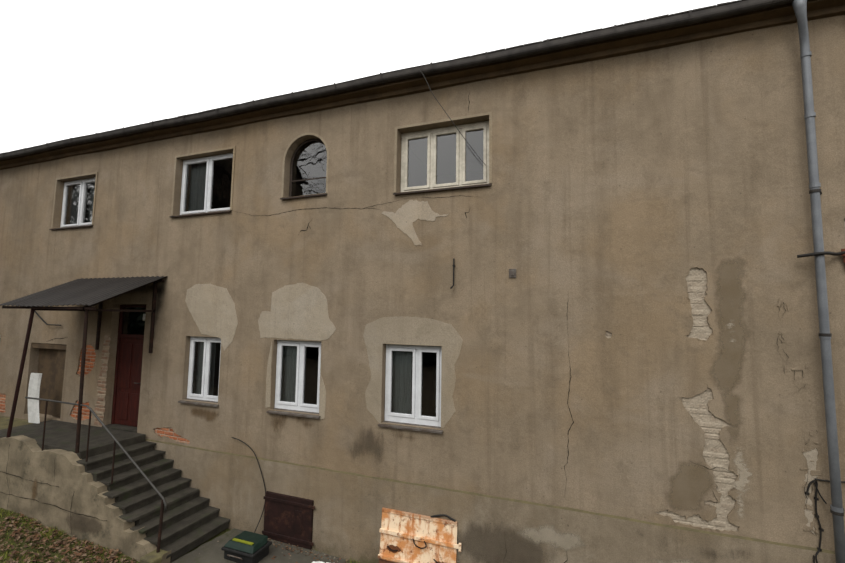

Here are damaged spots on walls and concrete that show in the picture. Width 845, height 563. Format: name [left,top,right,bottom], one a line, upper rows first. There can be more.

spalling [75,343,96,377]
spalling [69,400,92,421]
spalling [653,259,746,532]